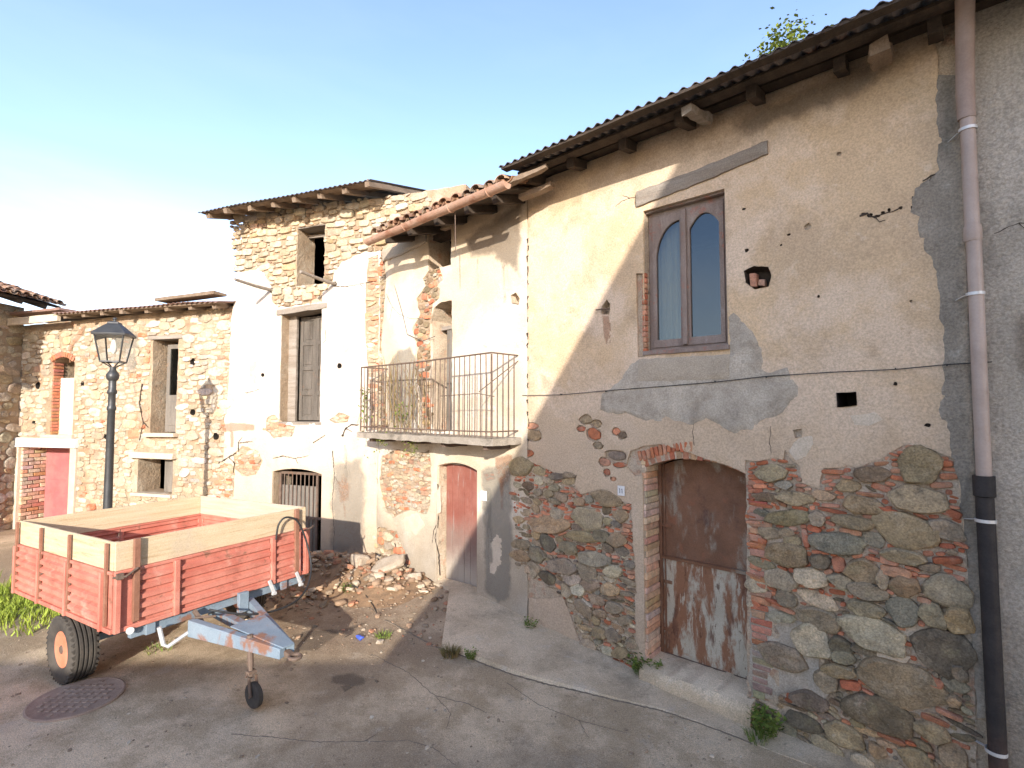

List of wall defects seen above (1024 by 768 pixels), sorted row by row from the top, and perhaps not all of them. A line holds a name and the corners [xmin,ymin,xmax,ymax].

spalling [212,446,263,499]
spalling [230,192,432,430]
spalling [372,449,441,568]
spalling [412,268,443,431]
damp [482,464,512,601]
spalling [489,416,692,668]
spalling [744,266,771,289]
peeling [836,392,883,426]
spalling [744,429,983,768]
crack [859,207,902,222]